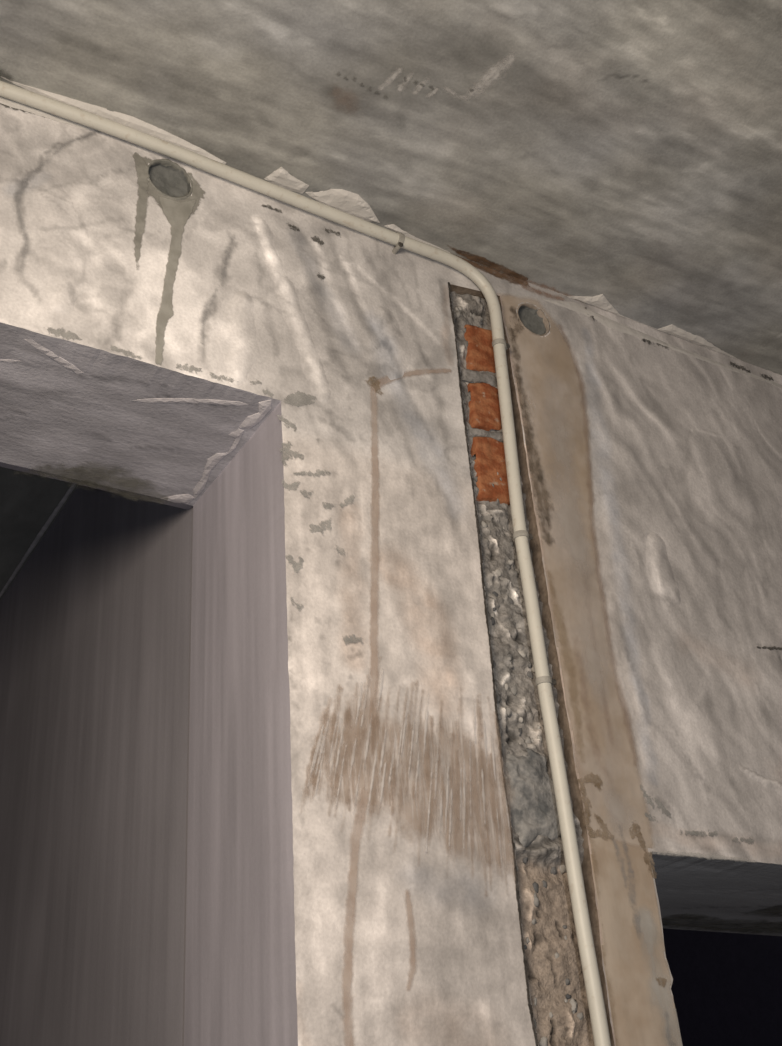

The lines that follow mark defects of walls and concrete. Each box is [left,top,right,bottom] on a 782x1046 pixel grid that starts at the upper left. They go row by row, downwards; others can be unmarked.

damp [133,152,205,365]
peeling [264,167,450,253]
flaking render [47,328,82,340]
flaking render [176,364,233,382]
peeling [532,283,774,381]
flaking render [131,381,331,504]
flaking render [286,555,304,572]
flaking render [310,496,355,533]
spalling [448,282,614,1046]
damp [311,696,510,864]